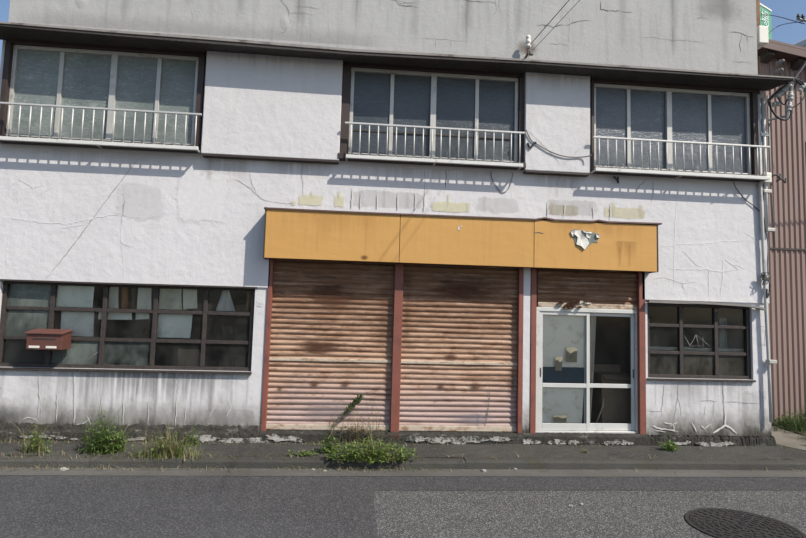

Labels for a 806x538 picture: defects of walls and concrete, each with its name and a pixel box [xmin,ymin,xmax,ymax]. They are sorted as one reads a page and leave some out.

crack [50,159,138,275]
peeling [548,202,579,216]
peeling [604,202,645,219]
rust [559,300,582,310]
rust [303,341,339,353]
crack [702,383,767,425]
spalling [189,433,305,443]
spalling [406,436,512,444]